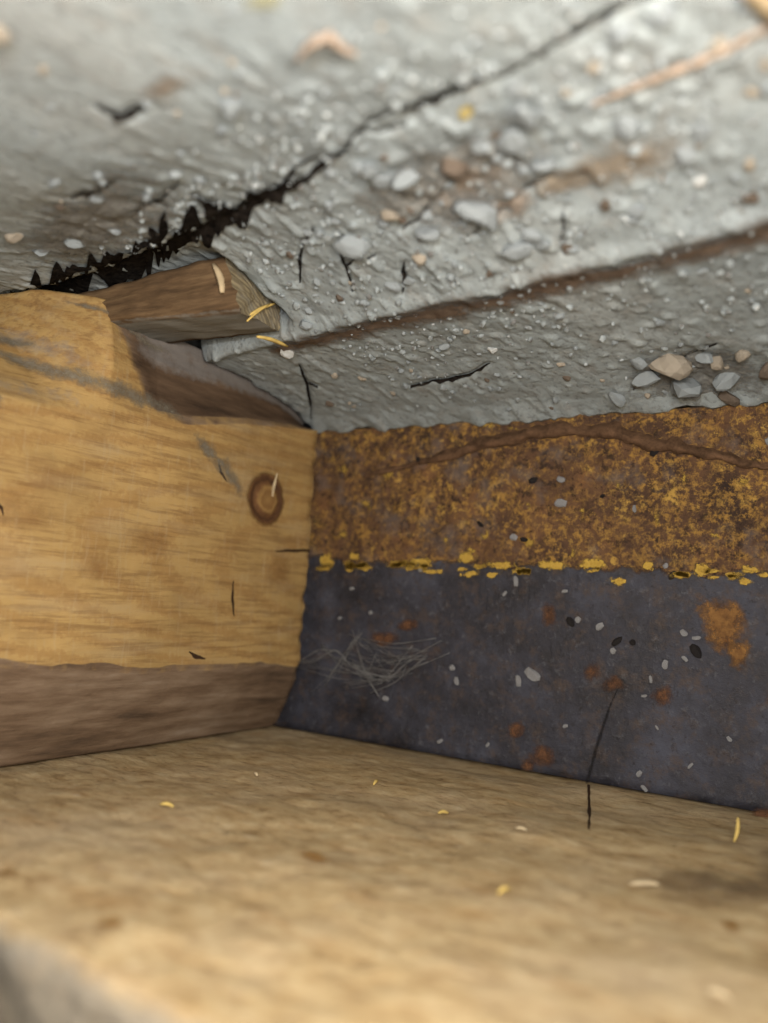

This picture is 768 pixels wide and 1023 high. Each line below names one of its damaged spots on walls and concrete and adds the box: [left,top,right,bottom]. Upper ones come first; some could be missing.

crack [10,0,638,294]
corrosion [308,403,768,586]
corrosion [699,602,749,665]